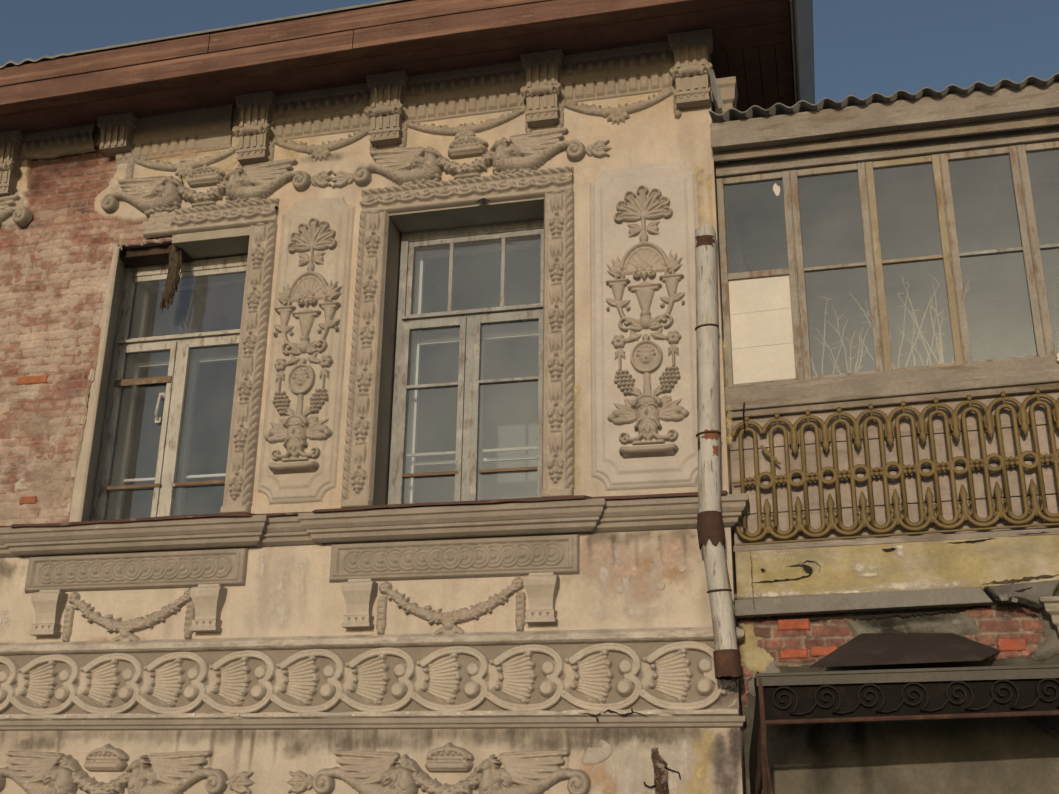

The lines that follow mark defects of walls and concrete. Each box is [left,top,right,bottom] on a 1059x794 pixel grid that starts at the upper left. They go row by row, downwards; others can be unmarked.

flaking render [0,147,173,526]
crack [738,551,1059,621]
flaking render [738,614,866,669]
flaking render [963,594,1047,660]